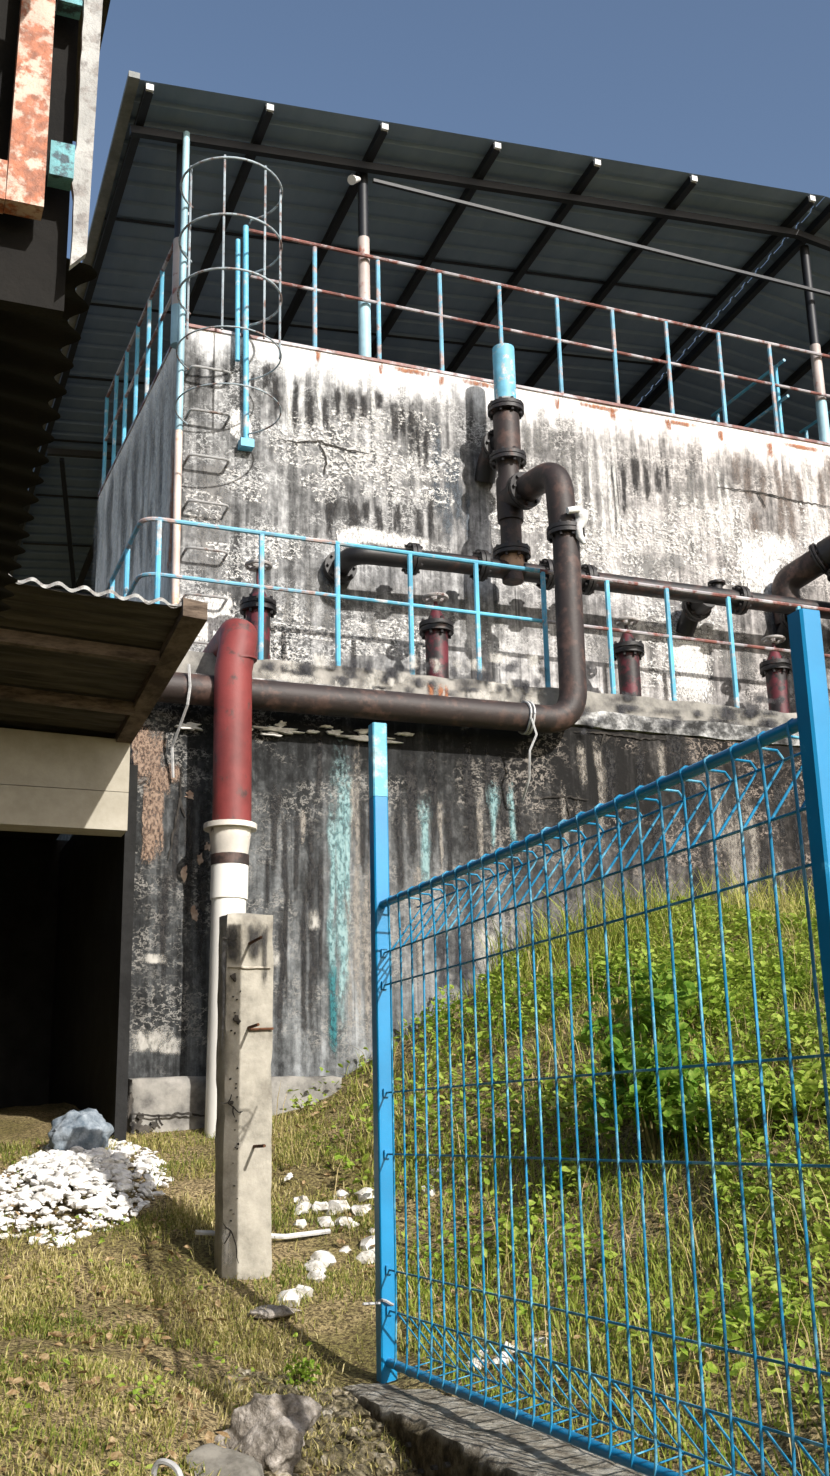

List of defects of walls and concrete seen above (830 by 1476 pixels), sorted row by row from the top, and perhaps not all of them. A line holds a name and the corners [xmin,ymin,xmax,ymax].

damp [195,360,230,393]
damp [251,363,470,538]
damp [525,427,830,576]
damp [269,580,331,628]
damp [367,594,415,639]
damp [460,597,503,644]
damp [159,800,208,970]
damp [222,782,370,1047]
damp [394,741,522,990]
damp [562,734,805,909]